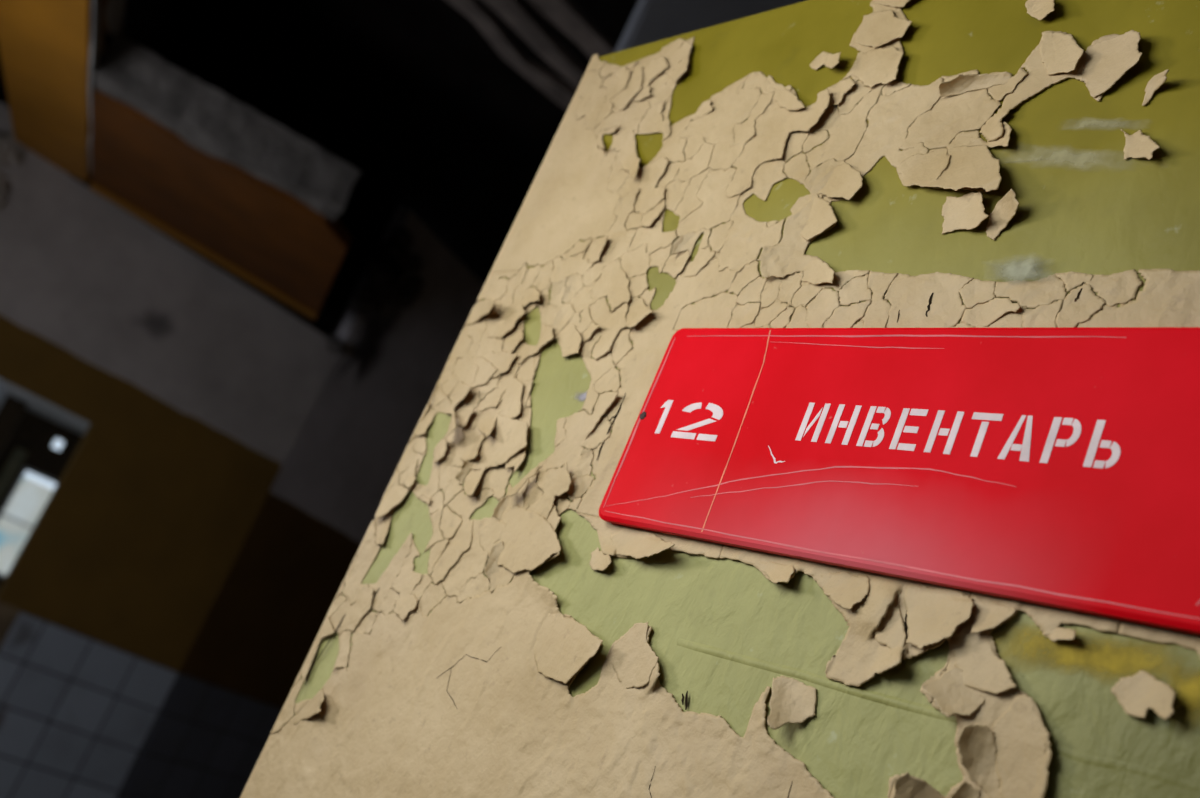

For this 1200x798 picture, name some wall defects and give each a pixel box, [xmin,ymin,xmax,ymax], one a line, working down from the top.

crack [597,393,626,459]
peeling [270,0,1200,735]
peeling [720,545,1200,798]